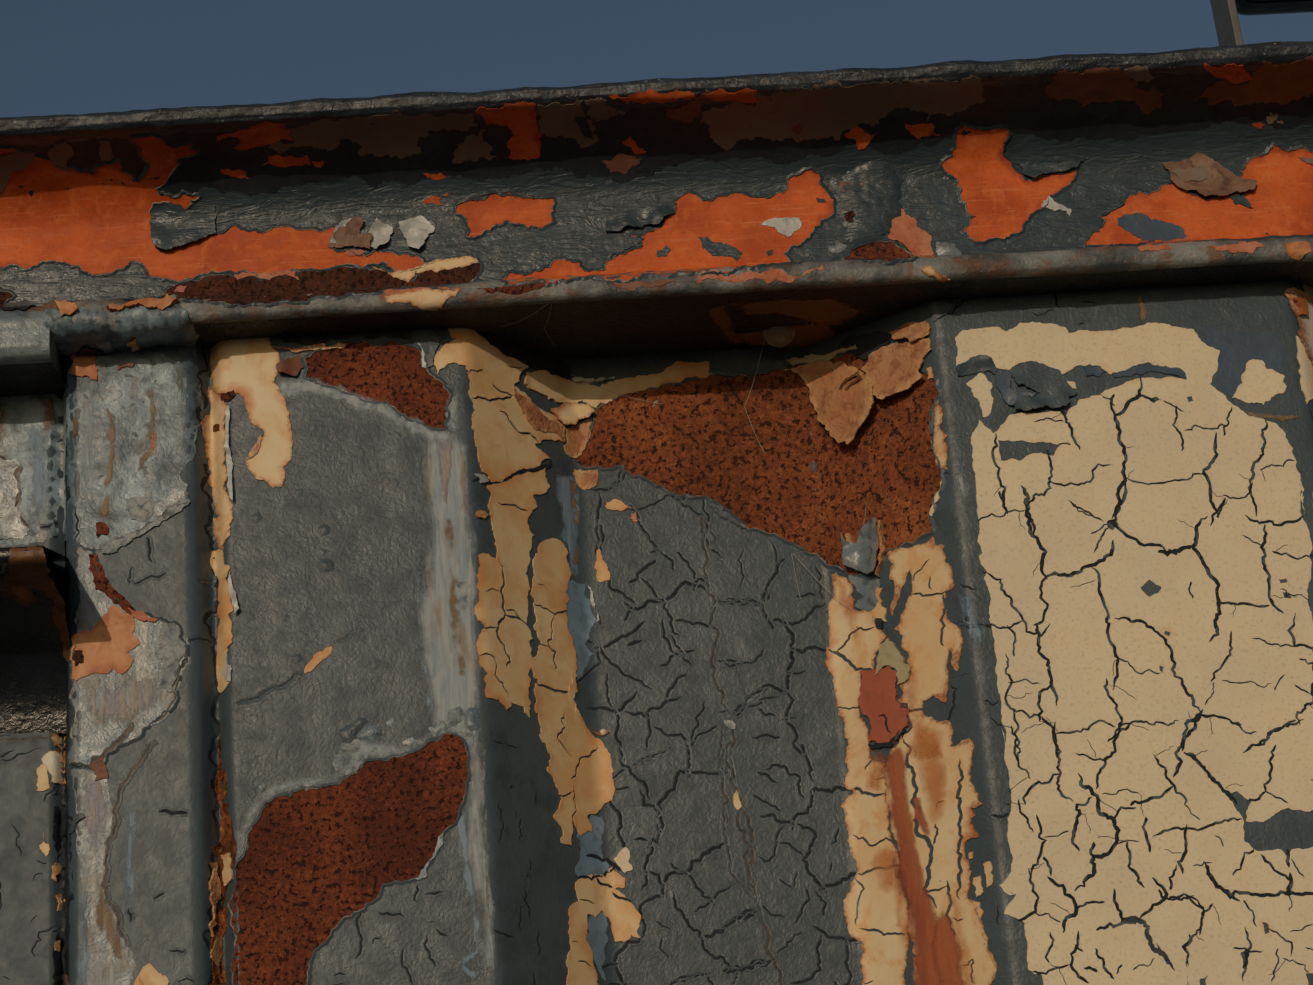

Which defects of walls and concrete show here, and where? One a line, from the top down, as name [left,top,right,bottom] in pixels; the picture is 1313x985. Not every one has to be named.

corrosion [158,255,557,308]
corrosion [272,338,456,440]
peeling [0,75,1089,312]
corrosion [571,353,947,578]
corrosion [1284,241,1312,260]
peeling [0,299,965,985]
crack [576,465,865,985]
peeling [825,284,1313,985]
crack [943,376,1313,985]
corrosion [208,726,474,985]
crack [491,783,544,985]
corrosion [871,730,964,985]